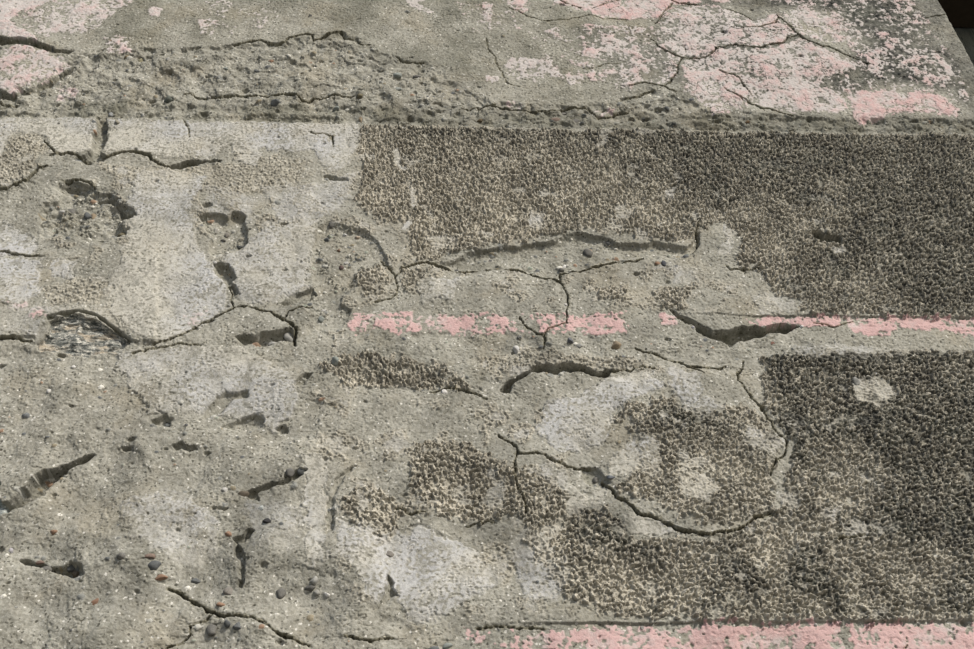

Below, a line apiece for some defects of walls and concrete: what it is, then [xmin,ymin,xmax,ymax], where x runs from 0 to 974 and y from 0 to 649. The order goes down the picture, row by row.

peeling [499,0,533,13]
peeling [503,57,564,82]
crack [459,0,871,120]
peeling [552,0,970,125]
crack [0,140,171,191]
flaking render [37,313,130,358]
crack [132,286,313,355]
crack [374,258,644,350]
peeling [658,309,974,347]
spalling [0,453,96,515]
crack [498,433,776,537]
crack [165,586,311,649]